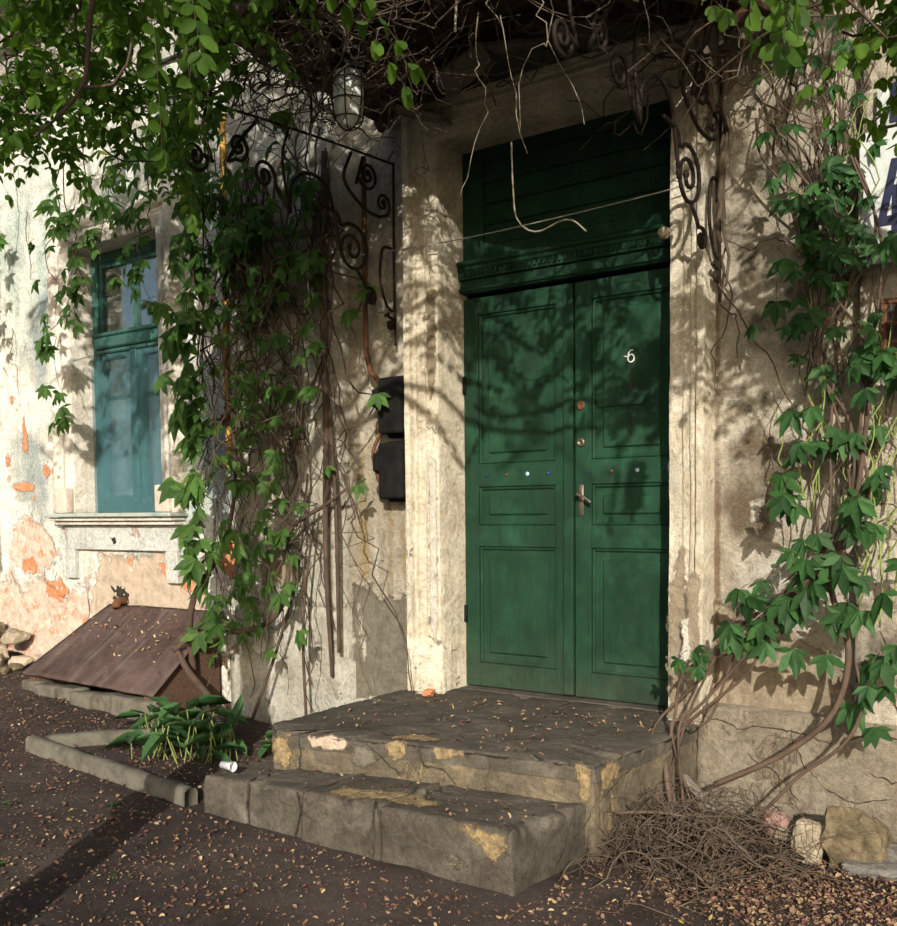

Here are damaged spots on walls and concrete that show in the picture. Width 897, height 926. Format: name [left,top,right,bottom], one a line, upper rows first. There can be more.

flaking render [20,417,28,453]
flaking render [0,452,208,657]
spalling [575,761,621,802]
crack [702,714,897,808]
spalling [454,824,507,860]